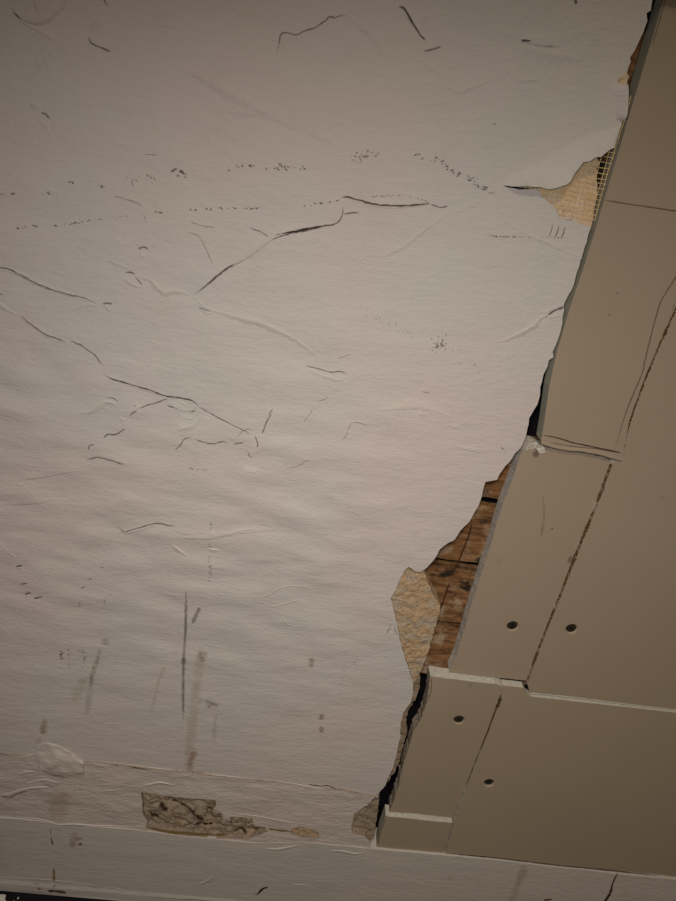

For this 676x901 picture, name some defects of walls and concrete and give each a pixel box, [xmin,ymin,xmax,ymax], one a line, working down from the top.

crack [399,6,427,42]
peeling [503,72,631,238]
crack [0,267,110,312]
crack [106,196,429,360]
crack [0,303,67,344]
crack [104,375,195,403]
spalling [522,371,546,453]
spalling [352,567,440,841]
spalling [142,792,319,836]